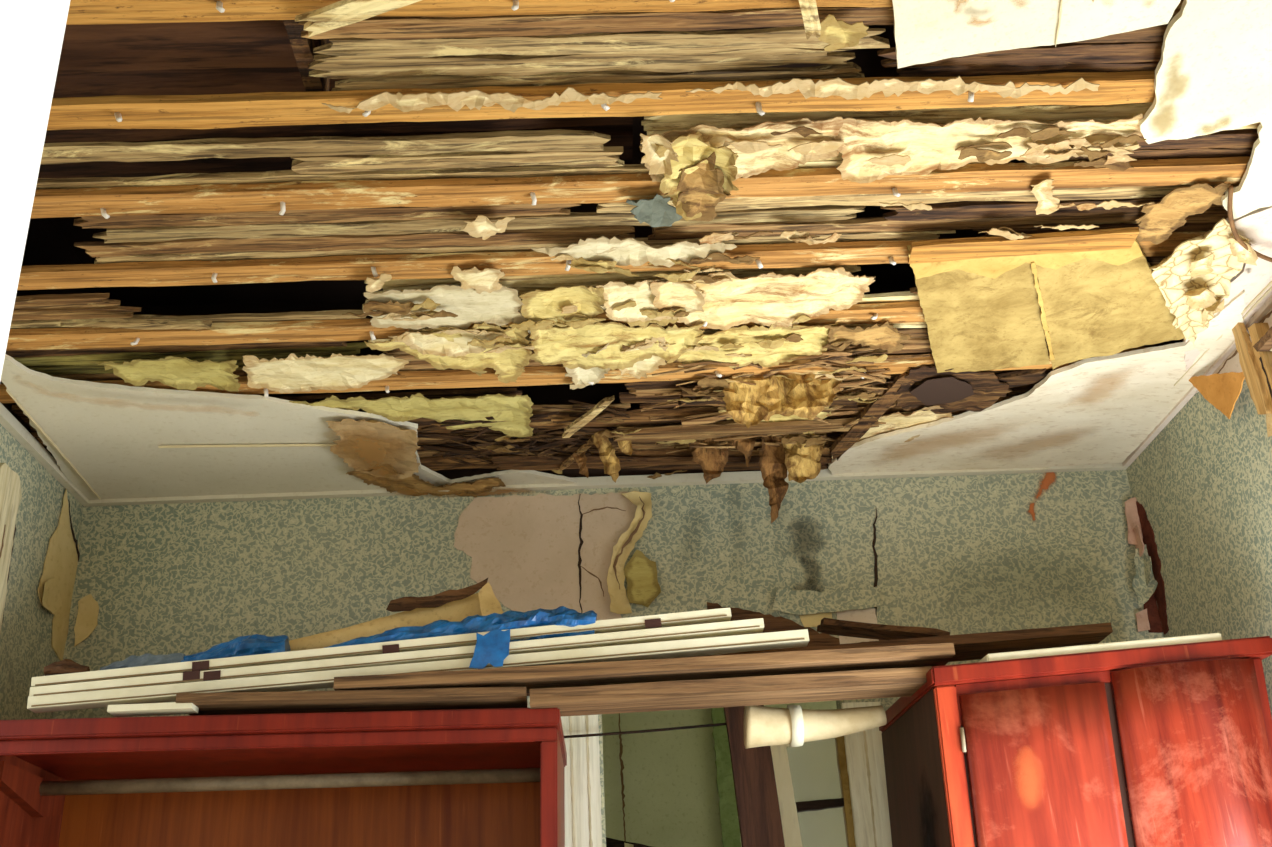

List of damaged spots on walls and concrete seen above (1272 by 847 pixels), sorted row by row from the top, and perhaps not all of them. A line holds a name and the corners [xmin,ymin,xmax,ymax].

peeling [626,113,1143,227]
peeling [1149,218,1258,348]
flaking render [1213,348,1243,374]
flaking render [1259,309,1272,328]
flaking render [454,492,637,621]
crack [578,494,625,613]
crack [871,508,879,617]
flaking render [1124,497,1169,635]